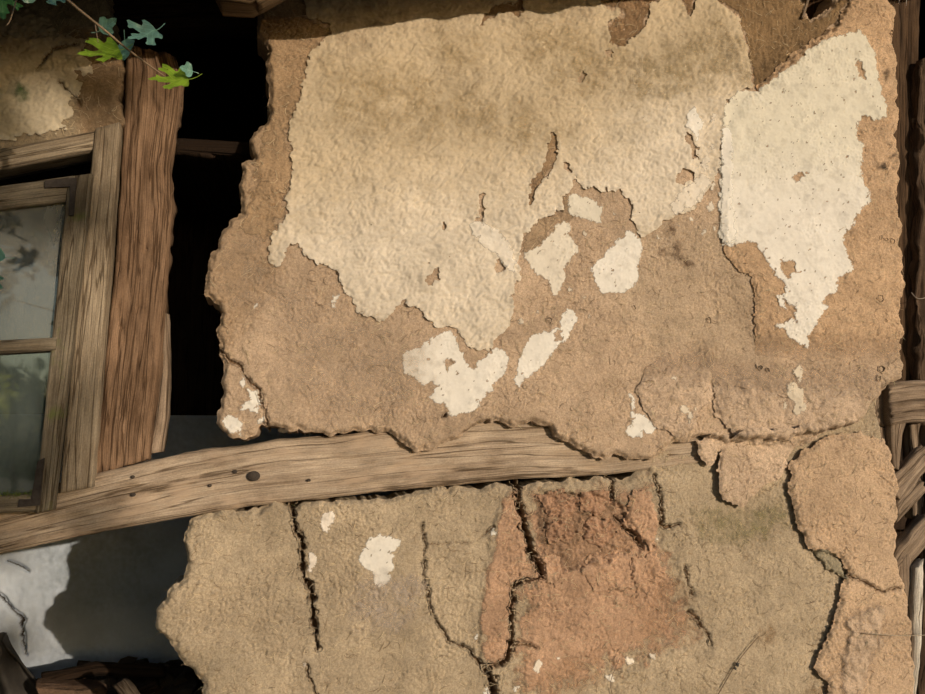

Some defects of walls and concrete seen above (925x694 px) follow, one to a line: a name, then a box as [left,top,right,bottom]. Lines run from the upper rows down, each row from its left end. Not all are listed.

peeling [242,0,905,417]
peeling [222,377,265,436]
peeling [625,394,656,438]
crack [0,594,27,656]
crack [5,560,30,572]
crack [288,501,322,694]
crack [421,479,547,694]
spalling [474,485,688,694]
crack [684,564,713,647]